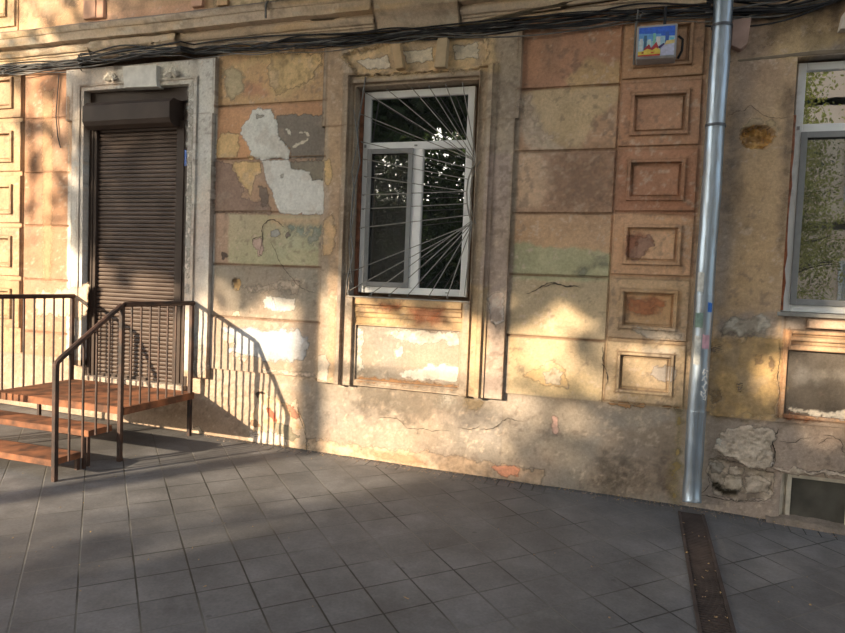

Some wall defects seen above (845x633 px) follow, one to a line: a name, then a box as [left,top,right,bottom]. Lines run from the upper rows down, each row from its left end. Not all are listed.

spalling [739,118,779,150]
flaking render [212,108,336,256]
crack [527,282,578,294]
peeling [222,327,330,382]
peeling [390,329,459,358]
flaking render [399,363,459,382]
peeling [523,360,569,389]
flaking render [706,314,845,502]
flaking render [248,388,545,485]
crack [772,429,845,473]